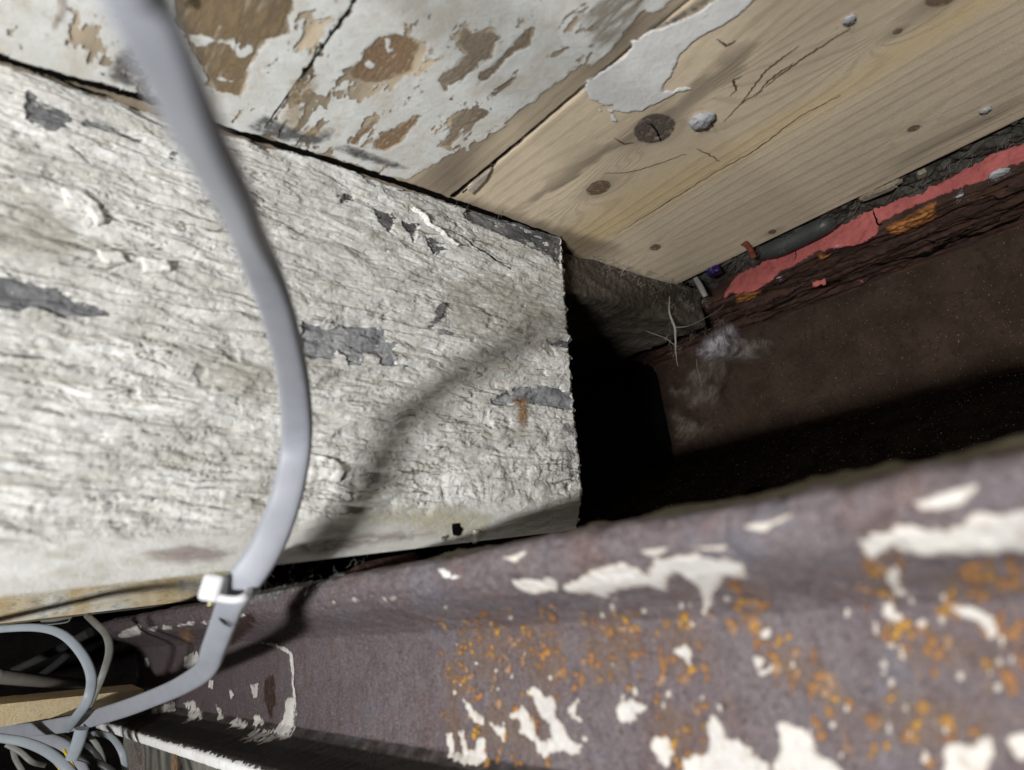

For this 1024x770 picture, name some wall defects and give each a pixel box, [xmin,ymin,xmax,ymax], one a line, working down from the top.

peeling [0,0,146,93]
peeling [25,90,143,142]
peeling [175,0,753,180]
crack [724,28,851,121]
crack [615,95,841,234]
peeling [0,277,110,317]
peeling [301,323,398,367]
rust [438,604,710,733]
rust [725,580,854,742]
rust [879,619,956,678]
rust [934,556,1024,697]
rust [864,686,981,758]